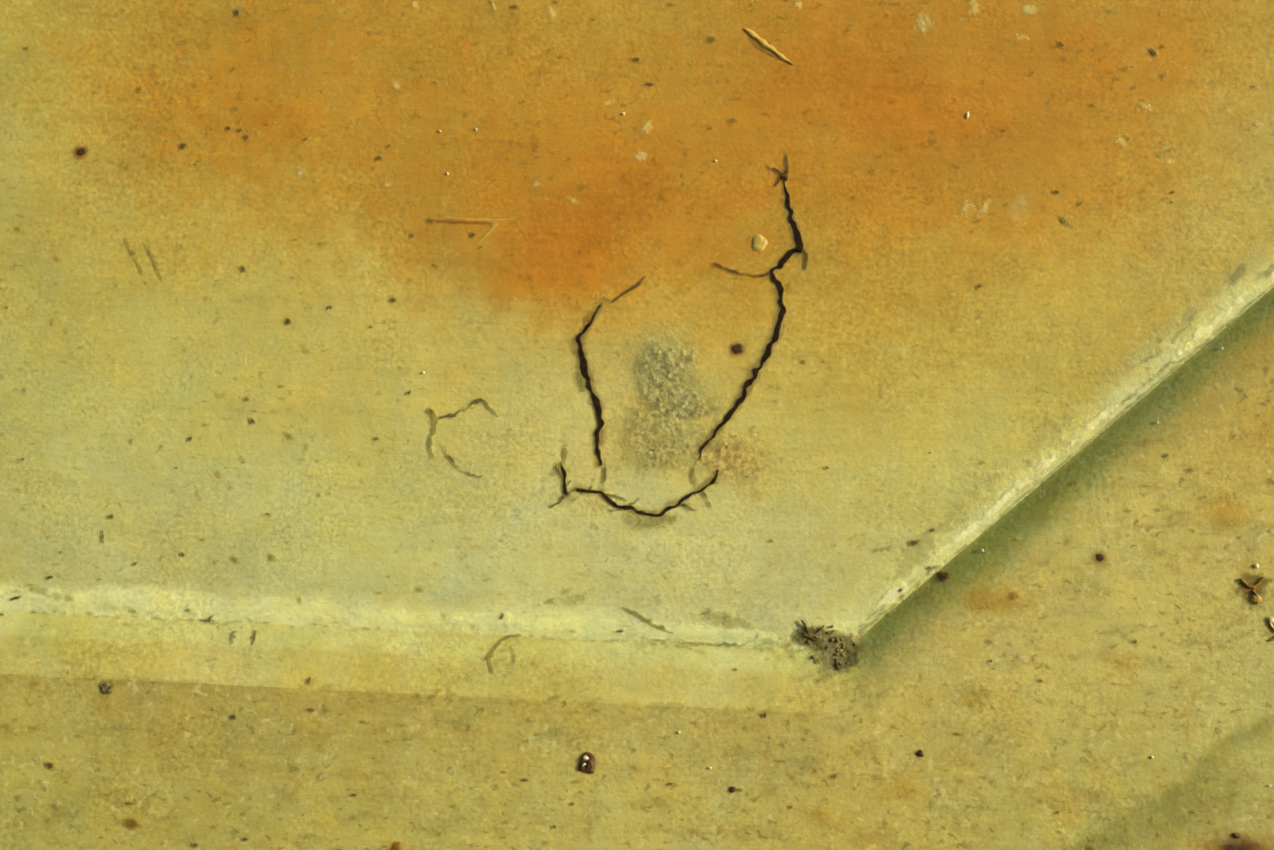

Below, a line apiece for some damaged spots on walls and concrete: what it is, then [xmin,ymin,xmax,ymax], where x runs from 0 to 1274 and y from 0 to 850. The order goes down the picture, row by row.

rust [107,0,1229,312]
crack [551,154,808,528]